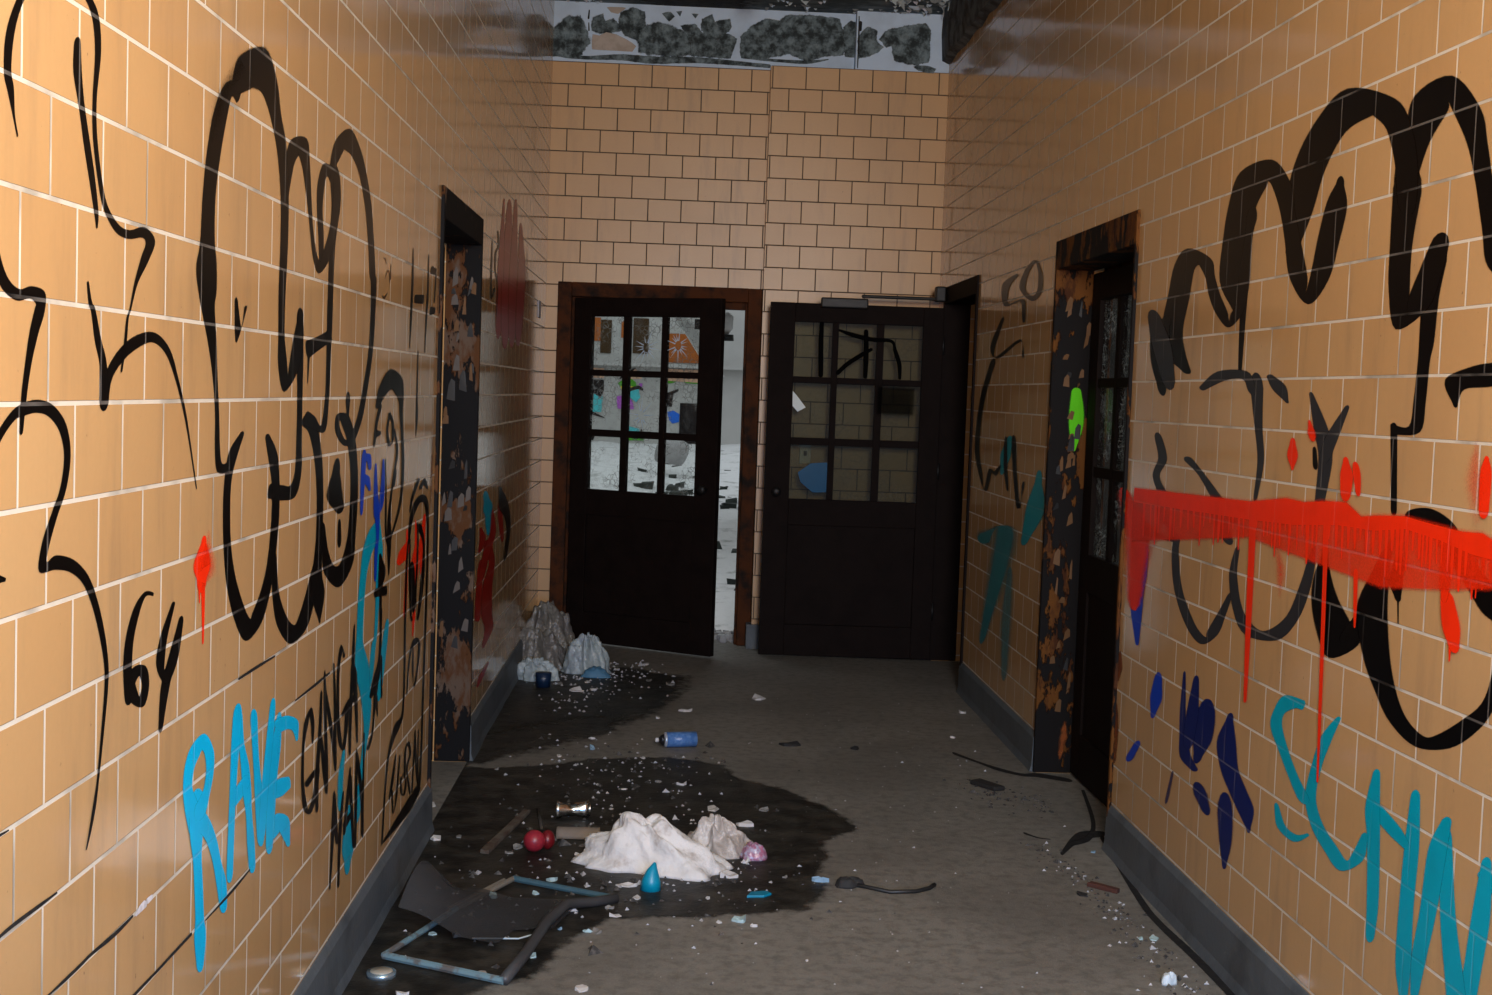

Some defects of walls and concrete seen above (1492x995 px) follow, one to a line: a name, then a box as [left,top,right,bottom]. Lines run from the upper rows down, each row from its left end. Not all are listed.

spalling [555,0,656,14]
flaking render [592,32,636,51]
spalling [740,0,952,20]
peeling [442,267,476,424]
peeling [1063,297,1091,388]
peeling [1053,411,1081,526]
peeling [442,460,471,593]
peeling [1053,549,1072,603]
peeling [438,618,469,649]
peeling [1049,629,1071,712]